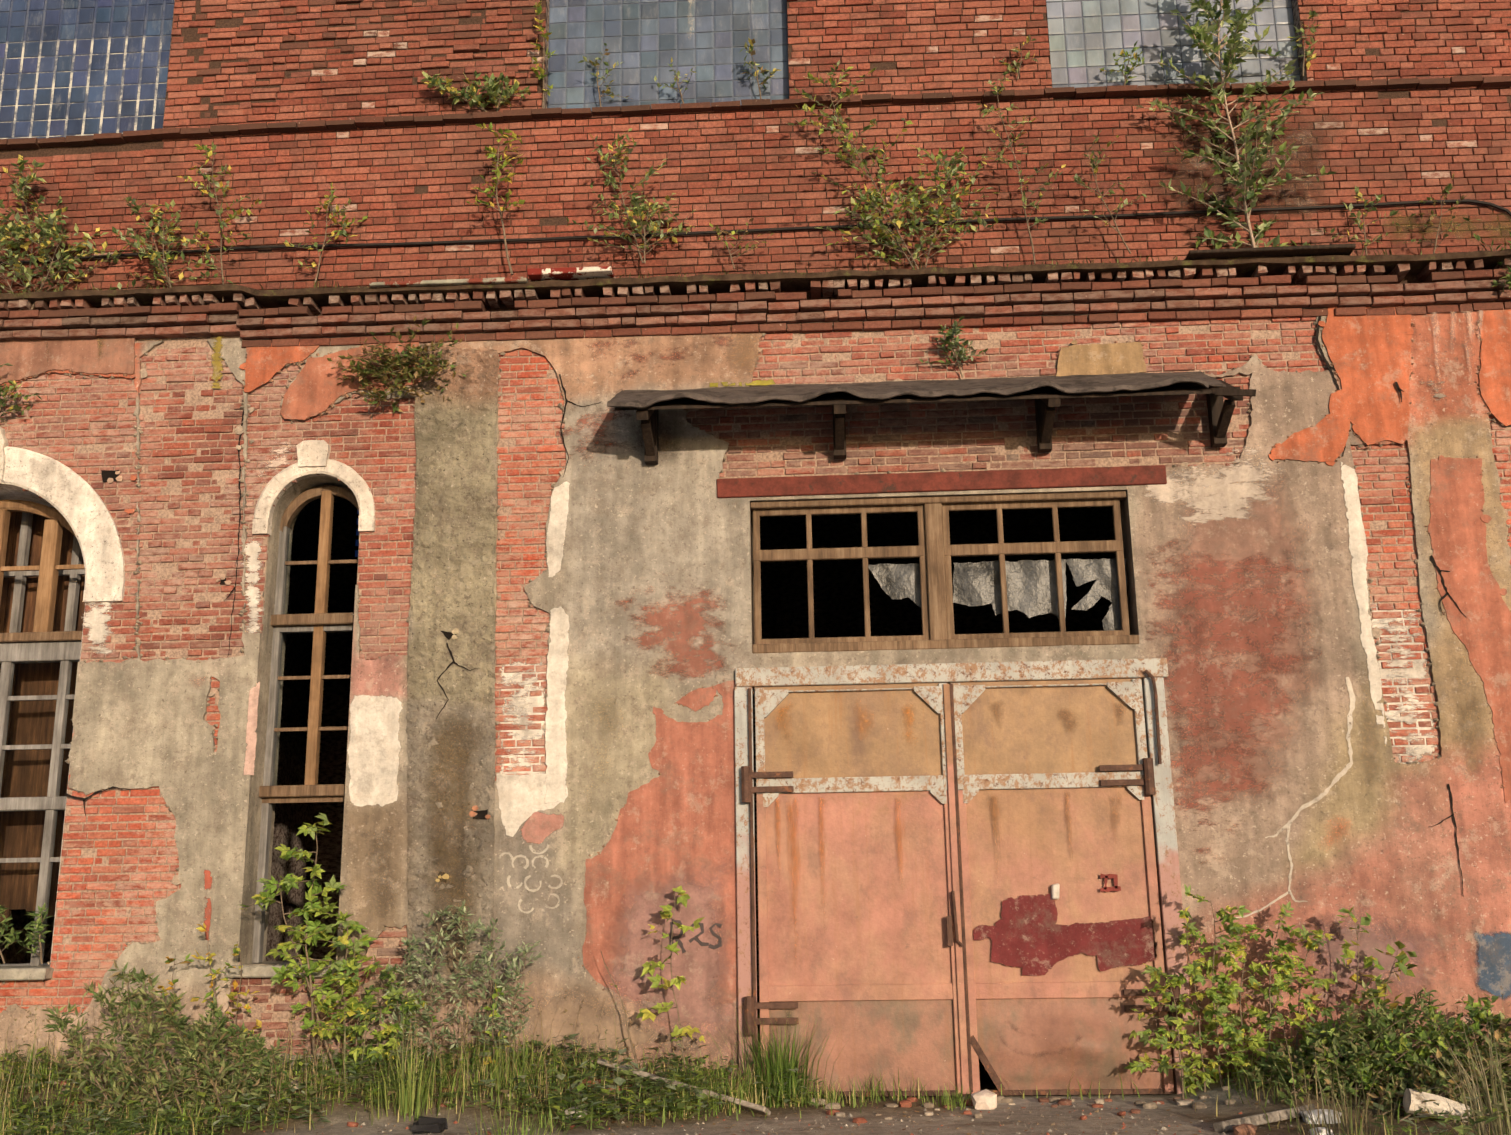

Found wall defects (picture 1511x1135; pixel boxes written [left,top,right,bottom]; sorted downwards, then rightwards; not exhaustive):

flaking render [0,719,185,1016]
peeling [204,870,212,940]
peeling [0,337,424,752]
crack [436,643,475,719]
peeling [521,812,564,844]
flaking render [495,350,630,781]
peeling [578,591,755,1005]
flaking render [684,304,1511,825]
crack [1236,677,1356,918]
crack [1430,555,1466,617]